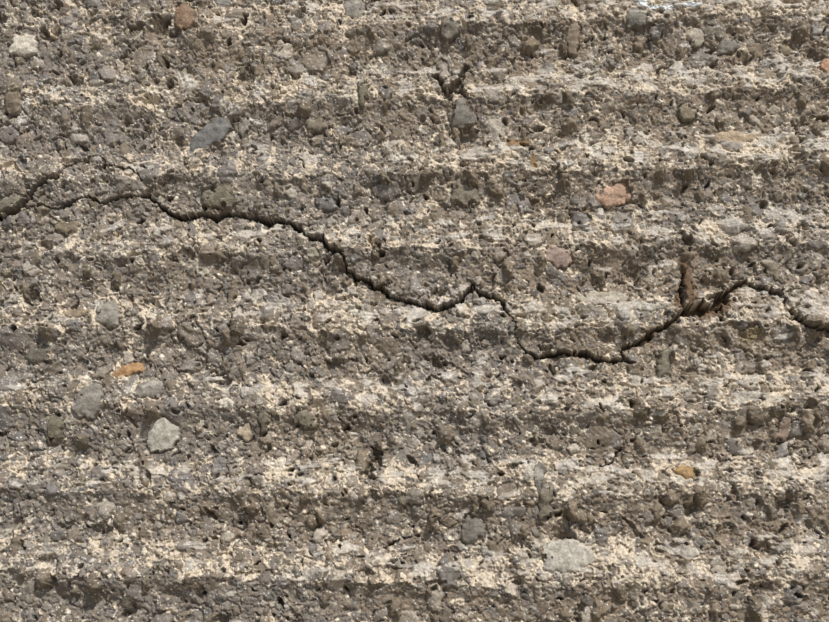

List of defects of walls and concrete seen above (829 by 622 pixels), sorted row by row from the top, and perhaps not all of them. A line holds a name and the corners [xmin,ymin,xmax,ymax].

crack [0,154,829,366]